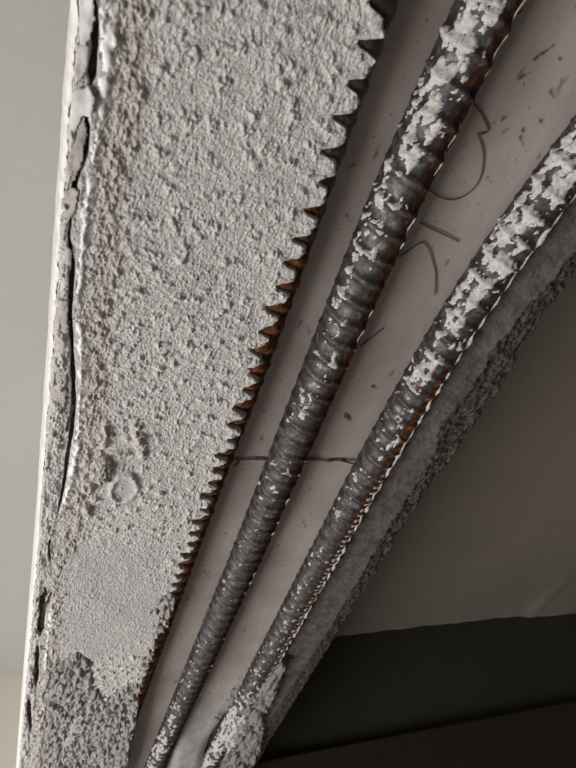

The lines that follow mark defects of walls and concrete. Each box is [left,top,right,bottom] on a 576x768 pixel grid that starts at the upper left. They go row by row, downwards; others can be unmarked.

crack [88,0,99,81]
crack [72,116,89,188]
flaking render [51,0,121,510]
crack [58,219,76,510]
spalling [128,0,576,768]
corrosion [194,0,523,702]
corrosion [136,206,326,724]
crack [233,458,266,466]
crack [307,457,356,465]
crack [27,587,51,727]
flaking render [41,608,56,669]
spalling [41,652,140,768]